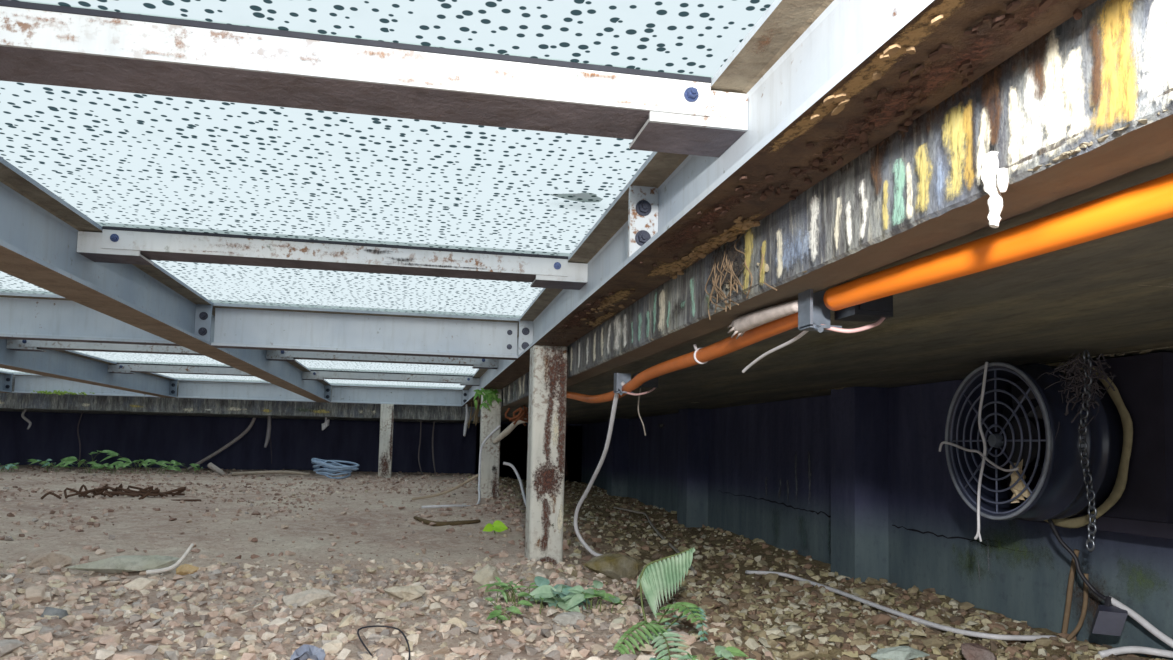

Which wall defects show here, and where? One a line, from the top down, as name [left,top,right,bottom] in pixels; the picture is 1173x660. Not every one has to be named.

rust [367,249,484,269]
rust [647,215,760,279]
rust [580,289,635,327]
rust [530,346,568,565]
crack [892,525,1024,552]